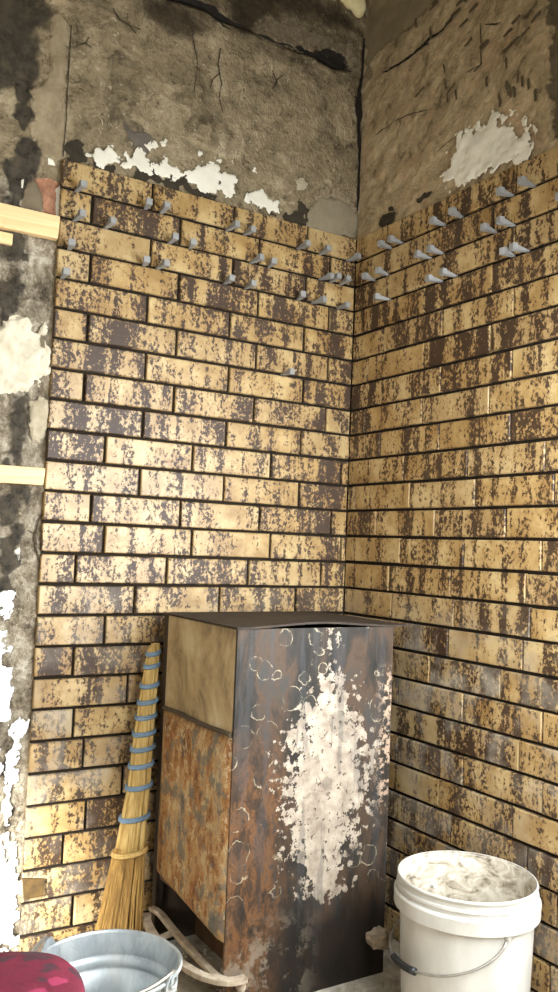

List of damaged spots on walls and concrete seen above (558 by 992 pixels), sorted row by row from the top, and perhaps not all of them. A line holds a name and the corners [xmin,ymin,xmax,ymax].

crack [113,8,141,34]
crack [466,22,501,73]
leakage [2,78,41,207]
peeling [85,139,280,214]
crack [168,0,452,211]
flaking render [379,206,395,228]
peeling [439,109,538,193]
leakage [0,229,28,320]
leakage [2,393,29,466]
leakage [0,484,32,593]
peeling [0,590,30,952]